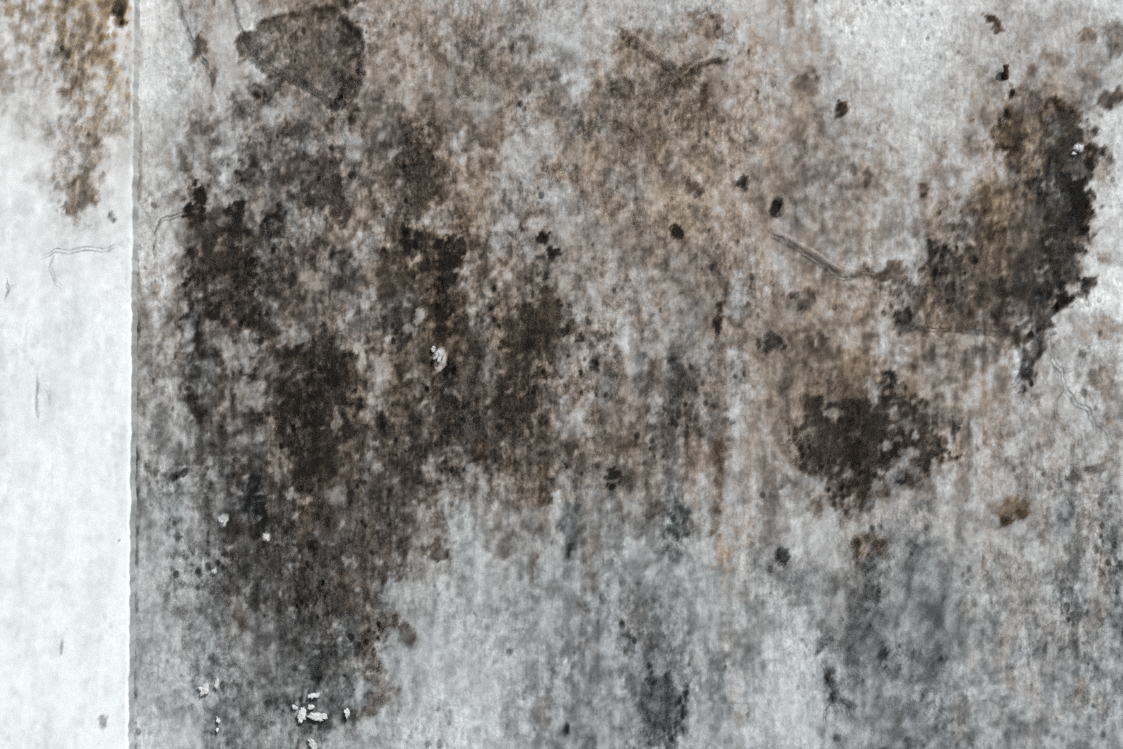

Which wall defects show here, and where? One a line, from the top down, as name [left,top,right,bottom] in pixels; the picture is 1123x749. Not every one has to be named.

water stain [46,0,128,214]
water stain [835,99,848,118]
water stain [985,15,1001,29]
water stain [1081,22,1123,58]
water stain [1098,86,1123,109]
water stain [772,284,816,312]
water stain [882,89,1110,397]
water stain [166,0,788,749]
water stain [793,371,961,511]
water stain [768,546,817,584]
water stain [821,525,966,749]
water stain [1025,467,1123,685]